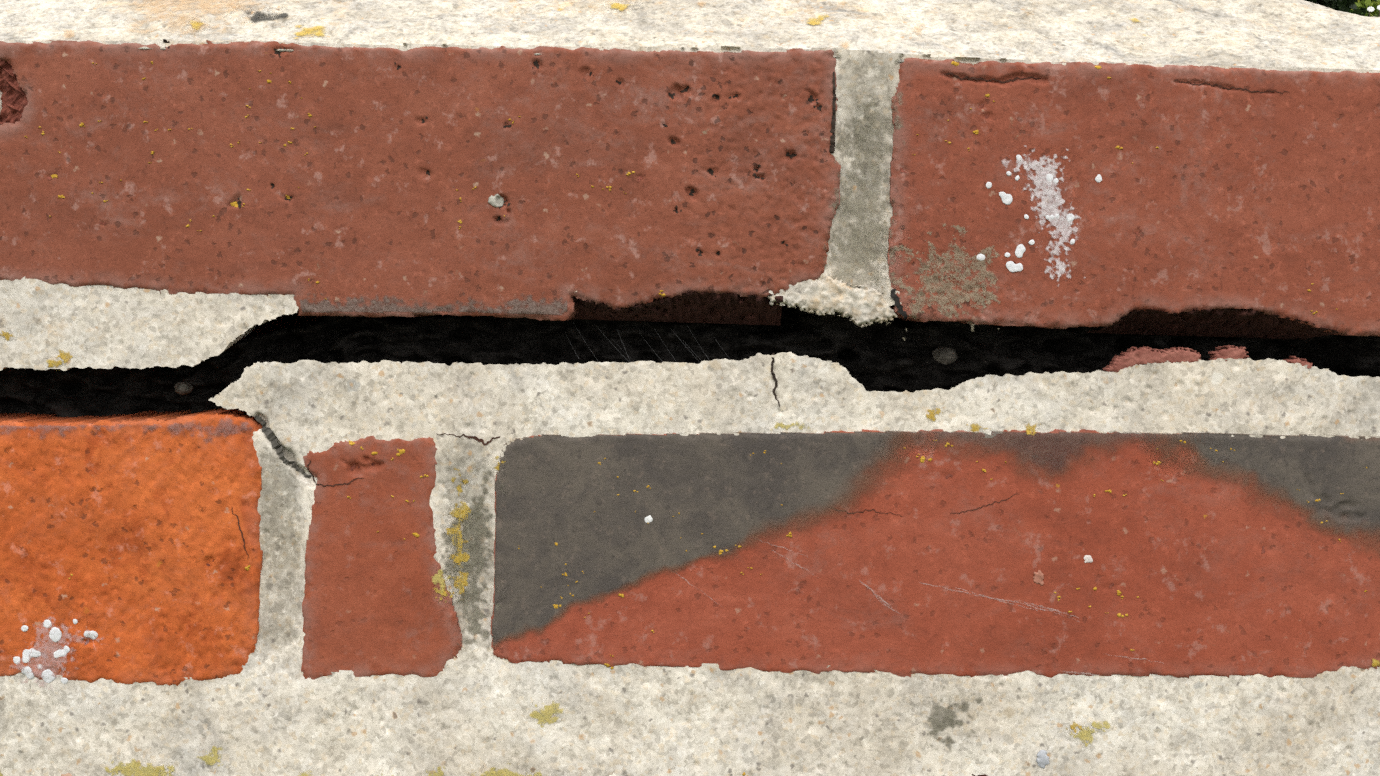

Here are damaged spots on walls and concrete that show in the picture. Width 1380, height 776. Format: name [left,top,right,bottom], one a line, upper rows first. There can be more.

spalling [0,59,28,125]
crack [0,289,1380,417]
crack [254,416,363,487]
crack [436,433,500,445]